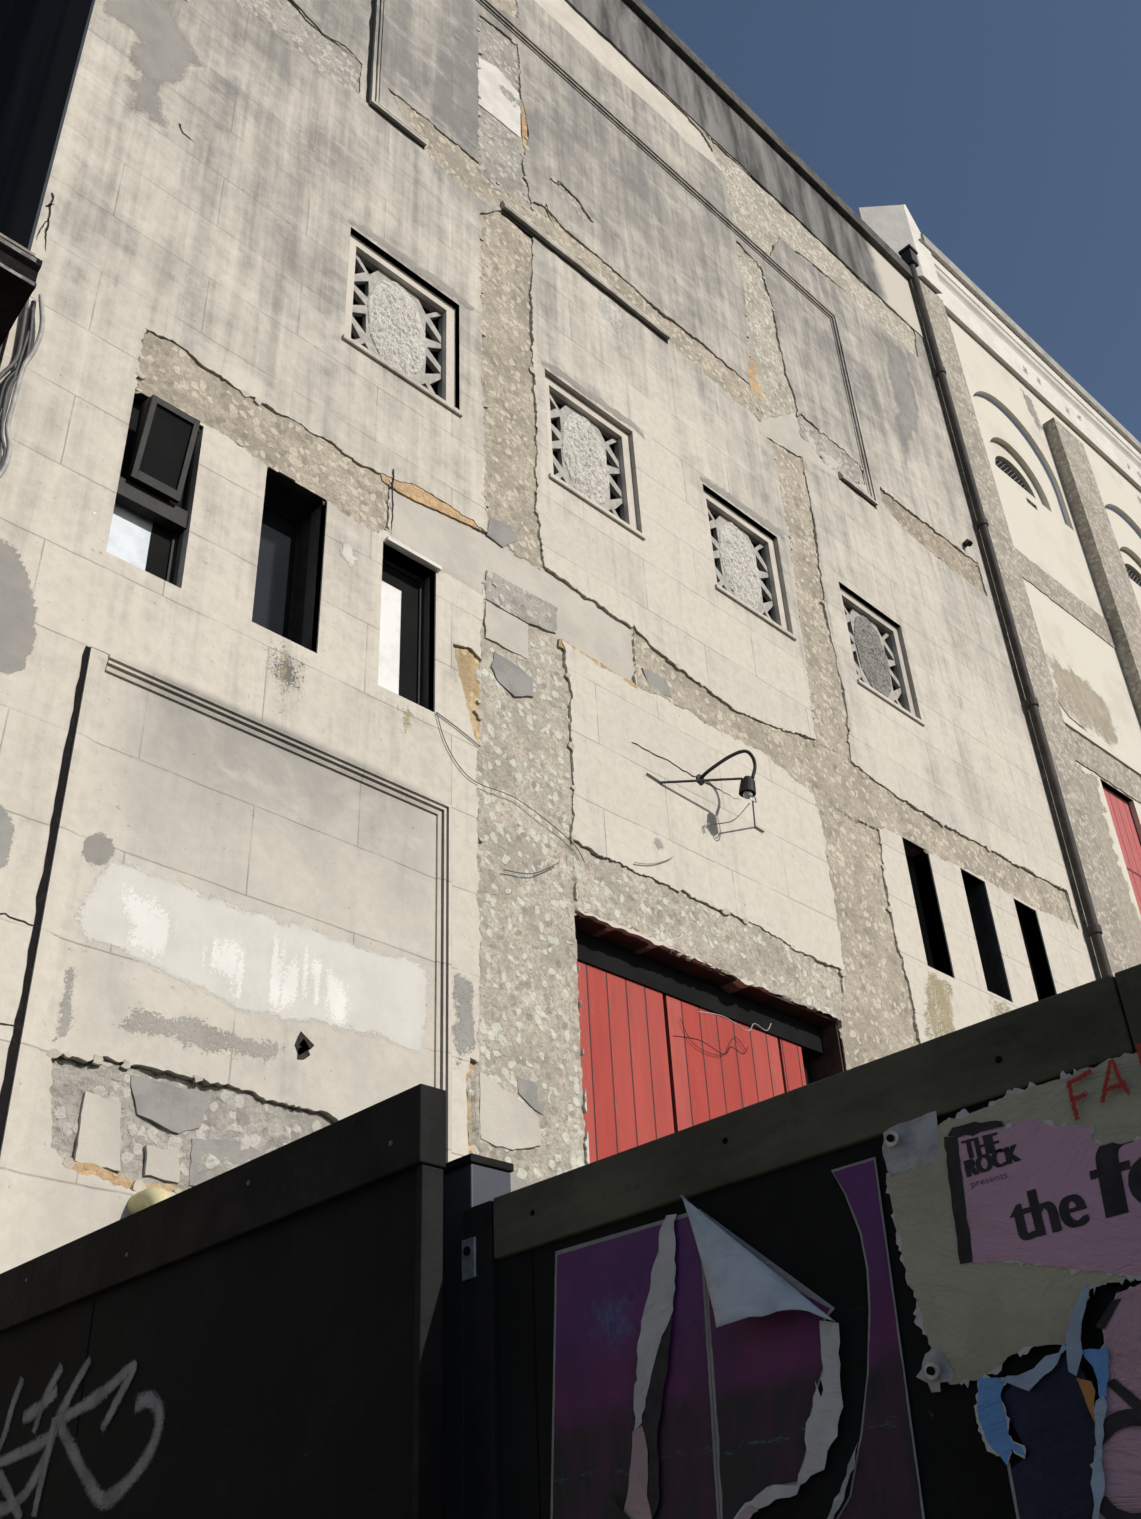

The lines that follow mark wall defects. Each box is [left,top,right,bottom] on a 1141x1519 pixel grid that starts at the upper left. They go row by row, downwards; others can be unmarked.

spalling [235,0,362,94]
spalling [135,331,389,533]
spalling [389,0,1077,928]
water stain [0,539,38,674]
water stain [0,804,15,869]
spalling [45,1048,333,1194]